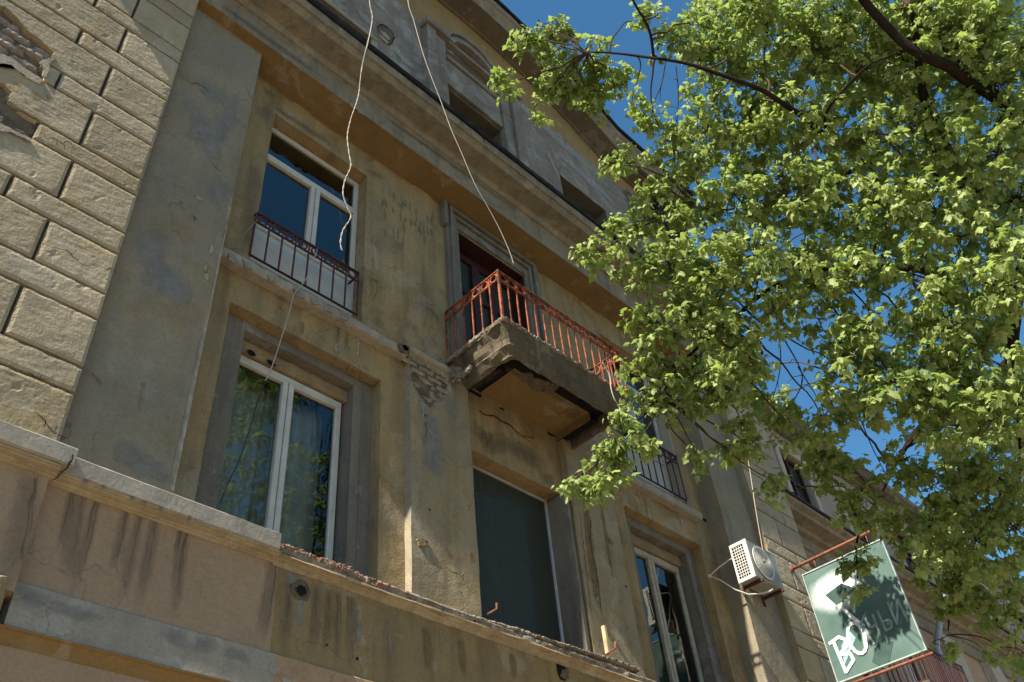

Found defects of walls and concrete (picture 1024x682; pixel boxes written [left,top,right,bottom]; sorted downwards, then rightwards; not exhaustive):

spalling [0,12,55,85]
spalling [0,87,37,143]
spalling [397,343,473,407]
crack [35,412,74,480]
spalling [280,542,424,601]
spalling [446,606,639,673]